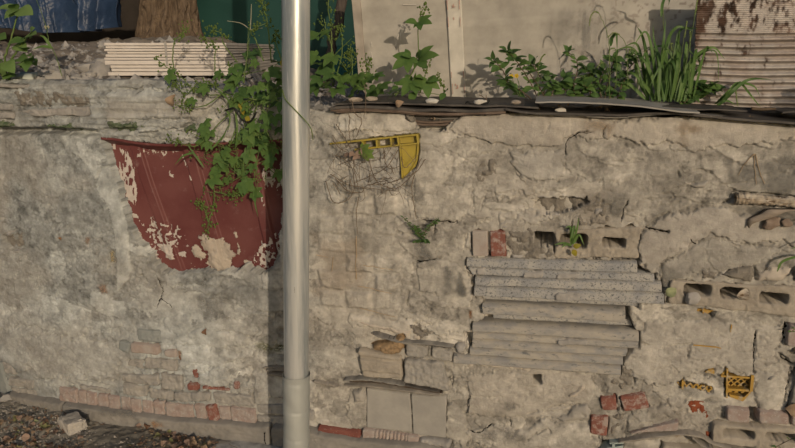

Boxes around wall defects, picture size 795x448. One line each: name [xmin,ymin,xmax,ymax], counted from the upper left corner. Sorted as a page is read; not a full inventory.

peeling [153,232,241,271]